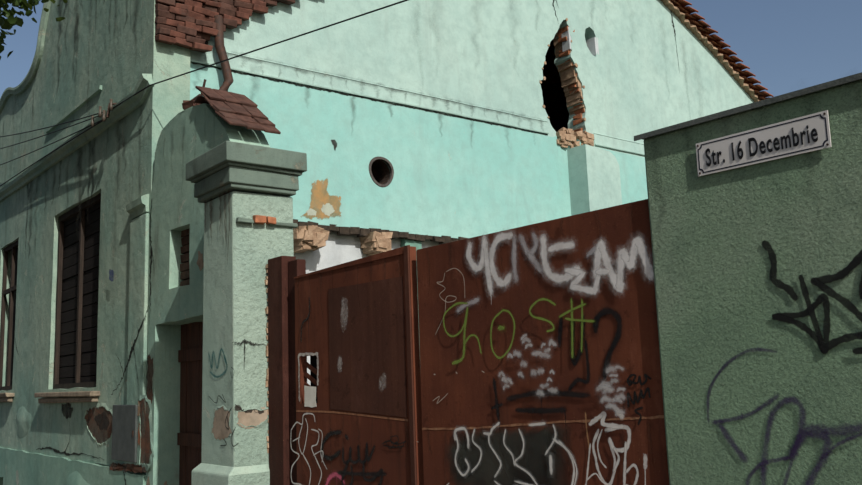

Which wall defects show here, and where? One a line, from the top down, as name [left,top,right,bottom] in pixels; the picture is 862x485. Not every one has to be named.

spalling [586,37,599,56]
flaking render [303,179,341,220]
crack [111,199,154,395]
flaking render [211,264,269,453]
flaking render [62,403,73,419]
crack [36,423,102,459]
flaking render [83,402,112,447]
flaking render [109,354,154,485]